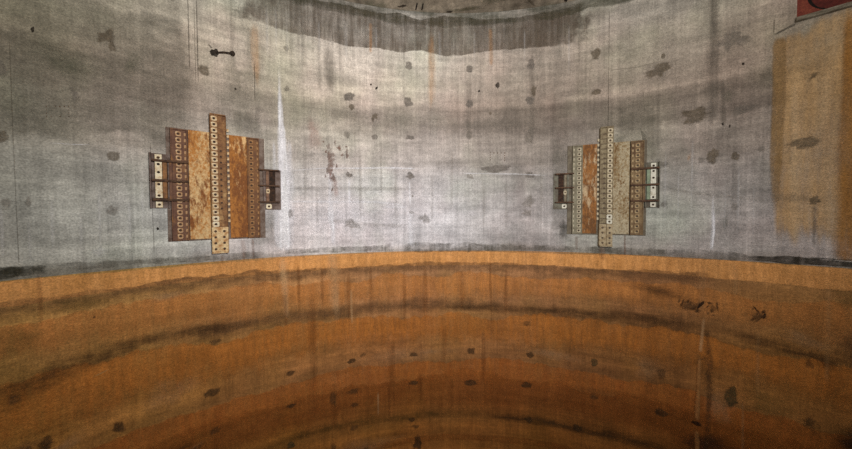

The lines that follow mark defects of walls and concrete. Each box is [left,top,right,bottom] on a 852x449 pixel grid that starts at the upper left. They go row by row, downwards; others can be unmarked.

damp [271,0,587,56]
corrosion [771,11,852,259]
damp [279,95,290,248]
corrosion [0,251,852,307]
spalling [678,298,718,316]